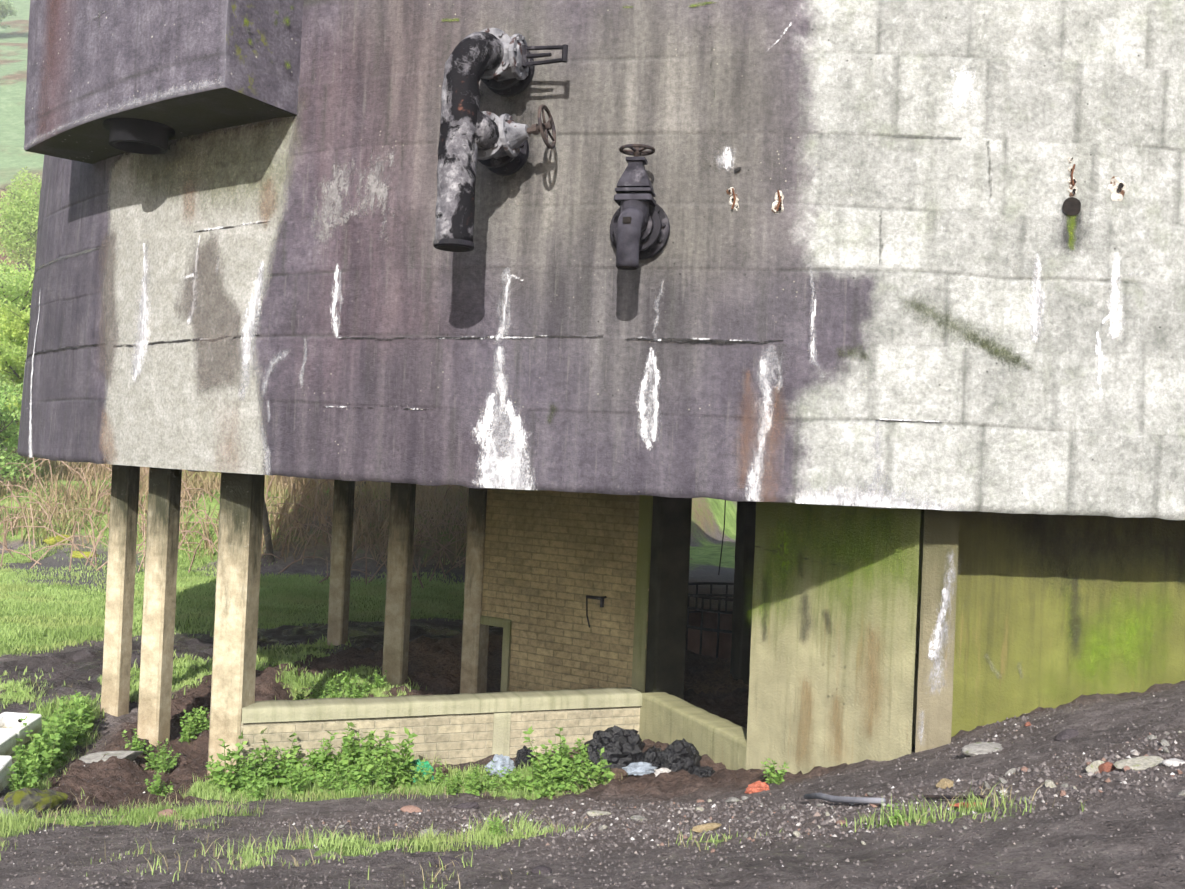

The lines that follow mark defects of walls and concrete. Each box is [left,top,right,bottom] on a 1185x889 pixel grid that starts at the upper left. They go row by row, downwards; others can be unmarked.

crack [194,221,269,233]
peeling [718,147,741,173]
spalling [726,187,739,211]
damp [100,116,295,475]
crack [25,334,259,361]
damp [475,270,532,490]
damp [638,349,660,448]
damp [746,356,780,501]
damp [929,555,954,690]